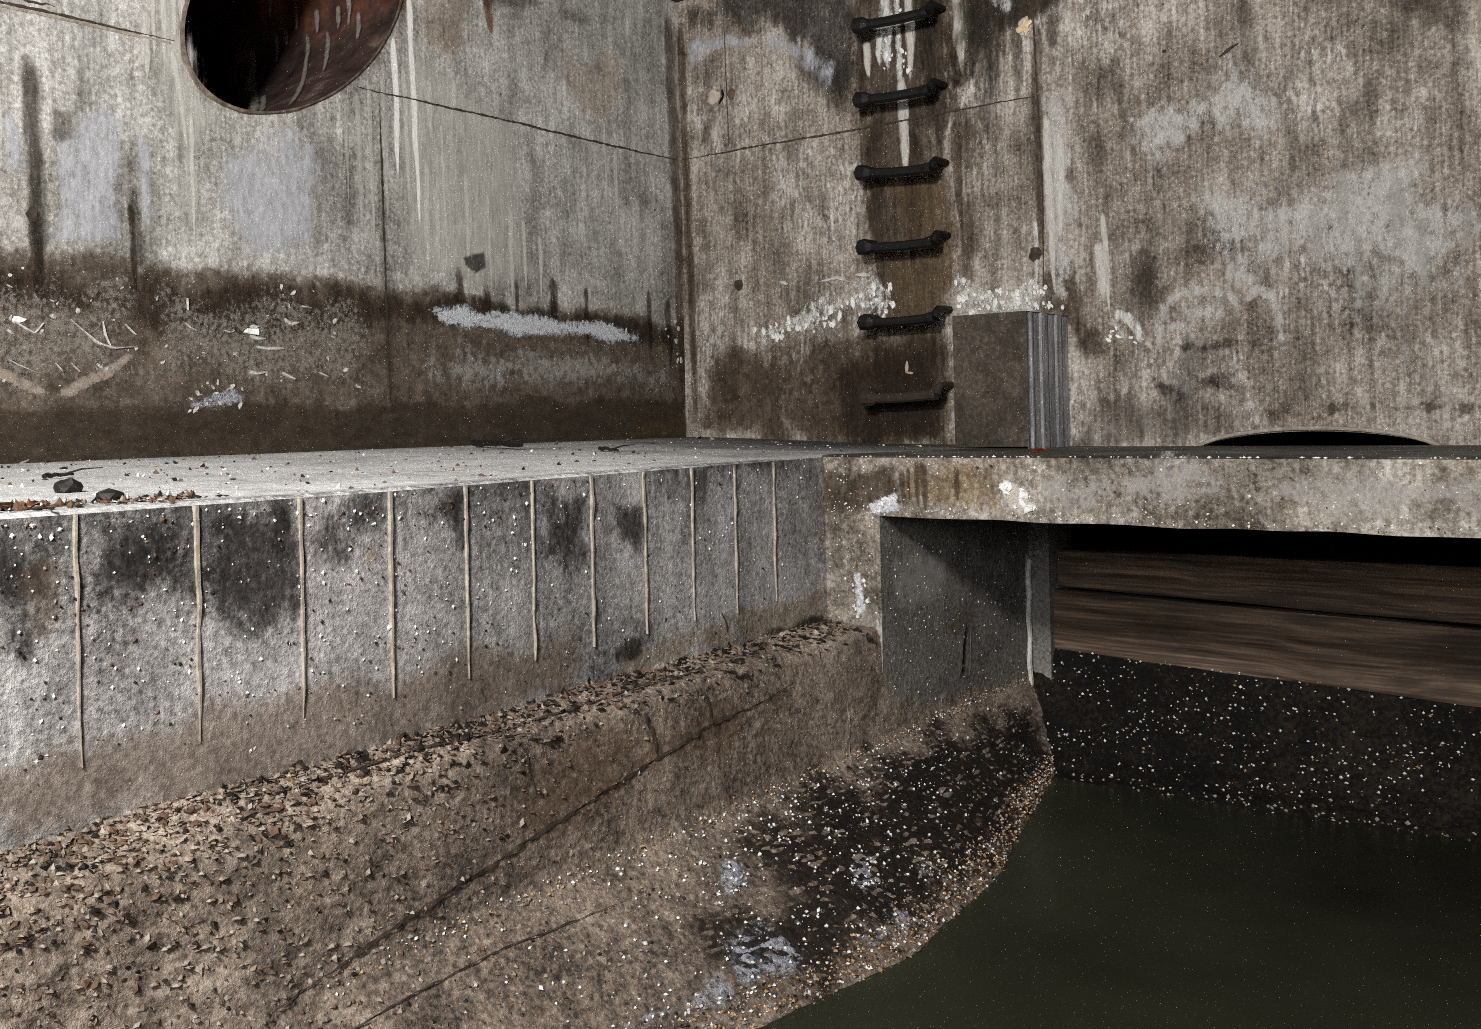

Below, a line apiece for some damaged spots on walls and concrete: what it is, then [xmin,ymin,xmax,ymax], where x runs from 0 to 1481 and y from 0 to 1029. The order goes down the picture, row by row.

leakage [690,0,935,166]
leakage [953,0,1049,85]
leakage [0,0,686,464]
leakage [1095,214,1110,311]